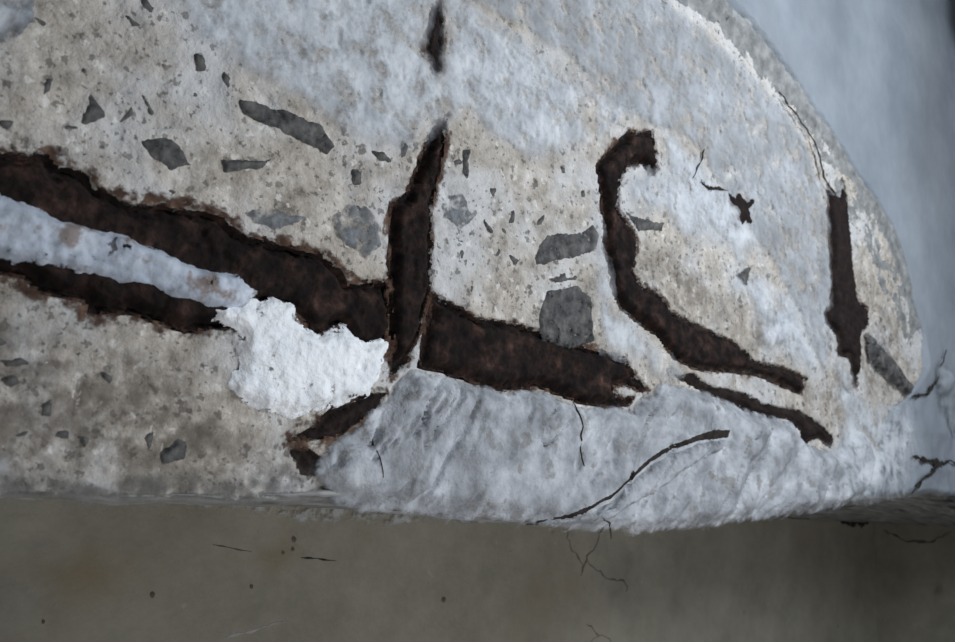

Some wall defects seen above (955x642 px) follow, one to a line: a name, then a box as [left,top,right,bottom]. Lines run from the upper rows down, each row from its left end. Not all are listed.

rust [419,0,447,77]
rust [37,145,76,169]
spalling [0,0,923,500]
rust [0,273,169,333]
rust [87,112,452,476]
crack [911,455,955,494]
crack [750,504,856,519]
crack [566,526,628,592]